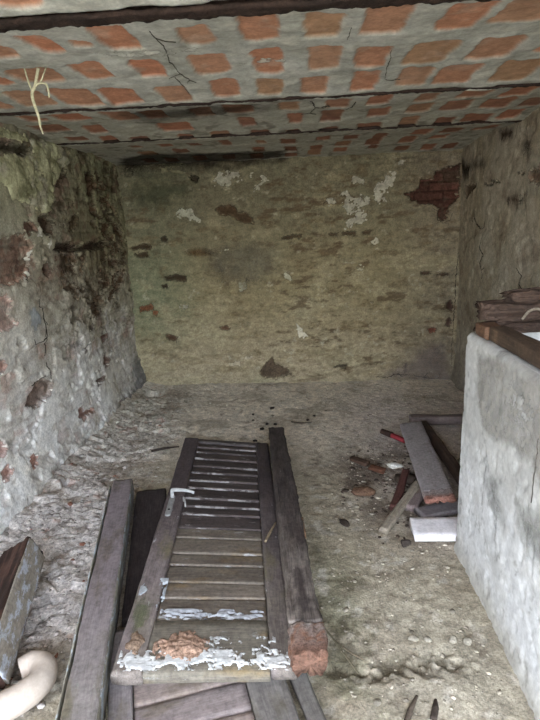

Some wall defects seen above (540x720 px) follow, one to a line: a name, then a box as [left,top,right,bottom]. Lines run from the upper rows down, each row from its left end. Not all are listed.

crack [149,31,196,95]
spalling [404,163,500,221]
spalling [0,170,152,333]
crack [32,299,52,386]